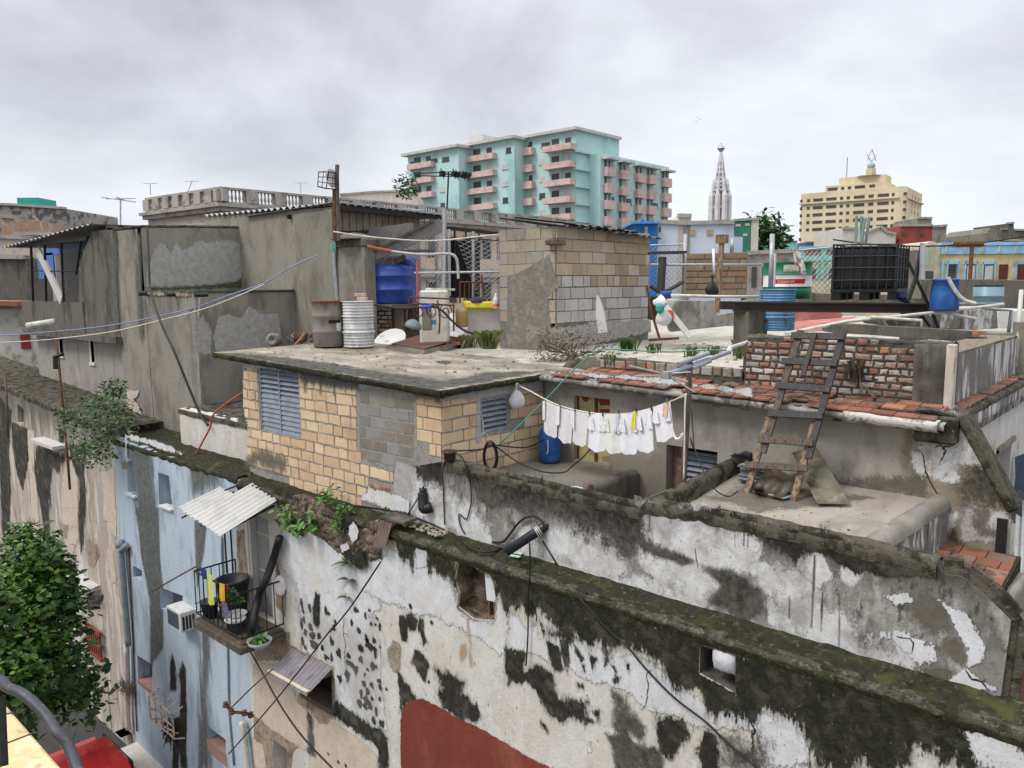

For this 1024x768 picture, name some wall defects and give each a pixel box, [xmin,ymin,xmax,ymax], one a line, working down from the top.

water stain [0,397,88,555]
spalling [236,529,249,583]
water stain [395,533,468,590]
water stain [680,486,945,623]
crack [919,444,946,494]
peeling [911,406,982,485]
peeling [948,511,961,532]
peeling [986,511,1011,531]
mould [300,592,480,768]
peeling [252,476,812,768]
water stain [478,561,986,768]
peeling [937,599,998,692]